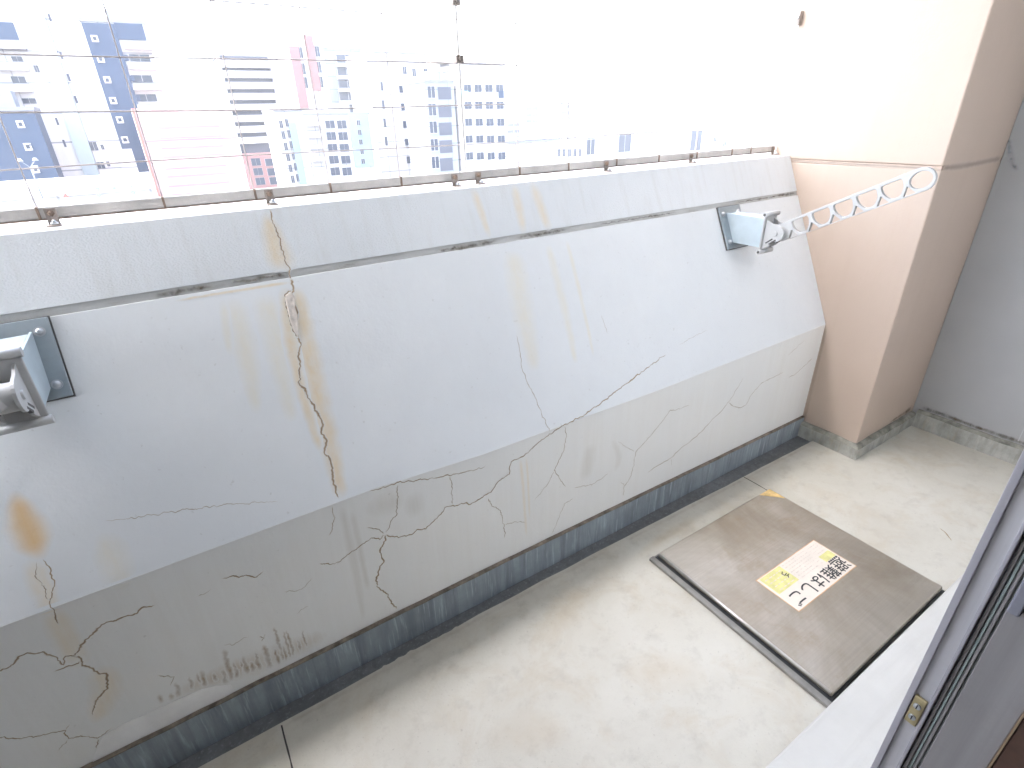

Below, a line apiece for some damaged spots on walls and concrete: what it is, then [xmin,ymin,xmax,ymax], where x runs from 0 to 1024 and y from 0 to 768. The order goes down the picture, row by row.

rust [175,212,349,499]
crack [269,210,339,535]
rust [1,490,90,665]
crack [34,558,59,625]
crack [0,604,157,752]
crack [105,501,278,521]
leakage [156,627,327,704]
crack [285,330,809,614]